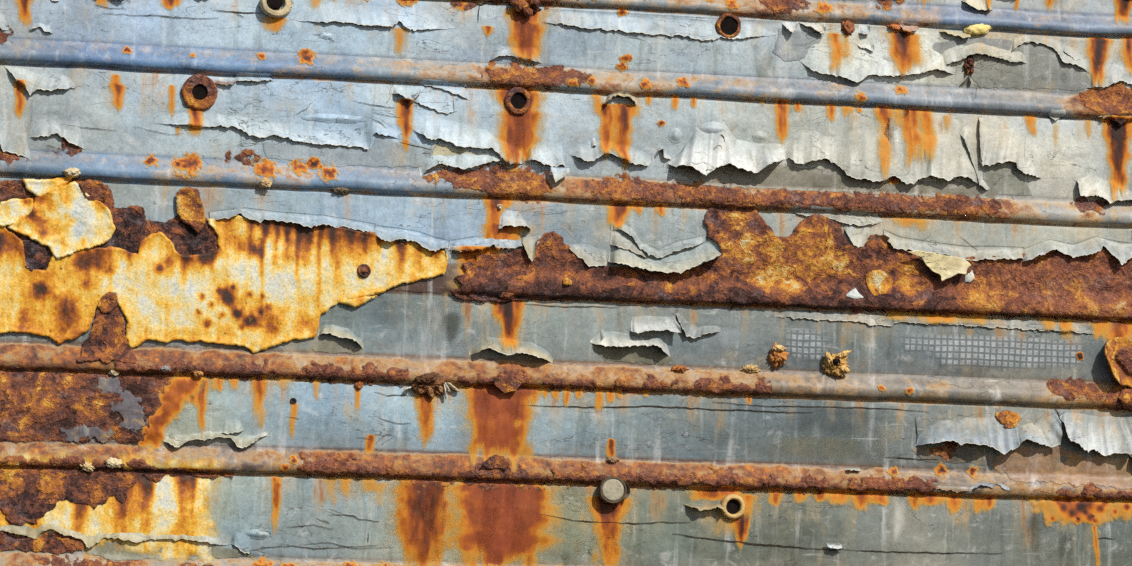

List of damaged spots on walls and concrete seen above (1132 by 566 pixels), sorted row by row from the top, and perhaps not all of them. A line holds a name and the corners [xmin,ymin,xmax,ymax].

peeling [543,0,1132,88]
peeling [155,79,1041,190]
corrosion [5,226,52,270]
corrosion [93,185,219,255]
peeling [569,223,721,274]
corrosion [423,0,1132,410]
peeling [1077,174,1132,204]
peeling [590,311,722,356]
corrosion [0,358,436,566]
corrosion [272,369,996,566]
peeling [915,410,1132,493]
corrosion [1026,482,1132,566]